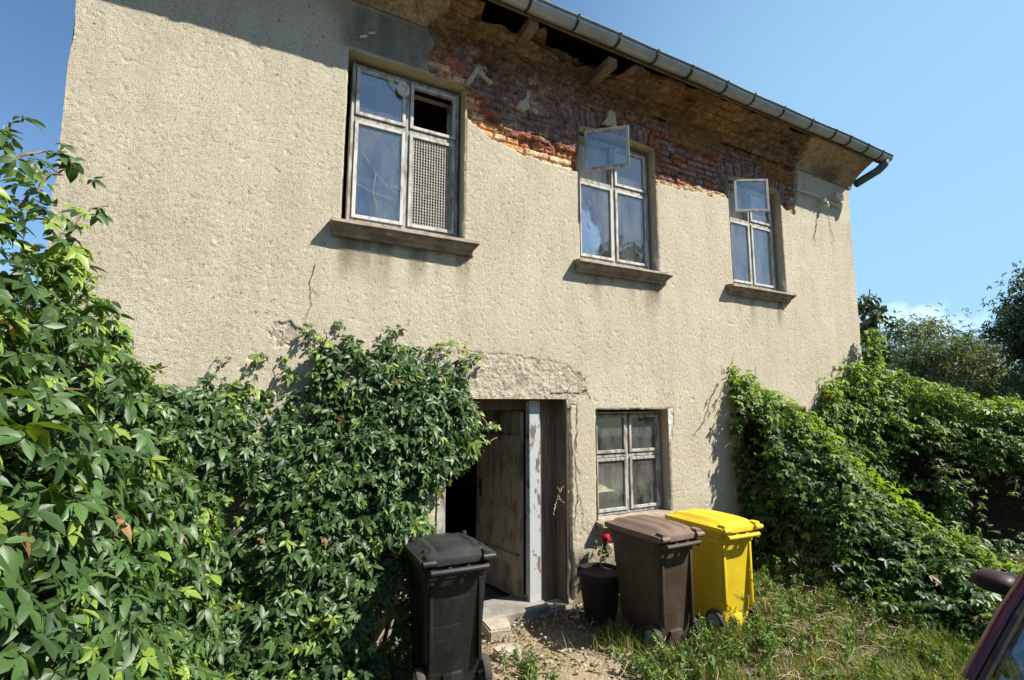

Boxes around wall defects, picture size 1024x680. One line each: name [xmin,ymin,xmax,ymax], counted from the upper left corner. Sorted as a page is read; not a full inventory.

flaking render [423,33,795,214]
flaking render [429,349,586,599]